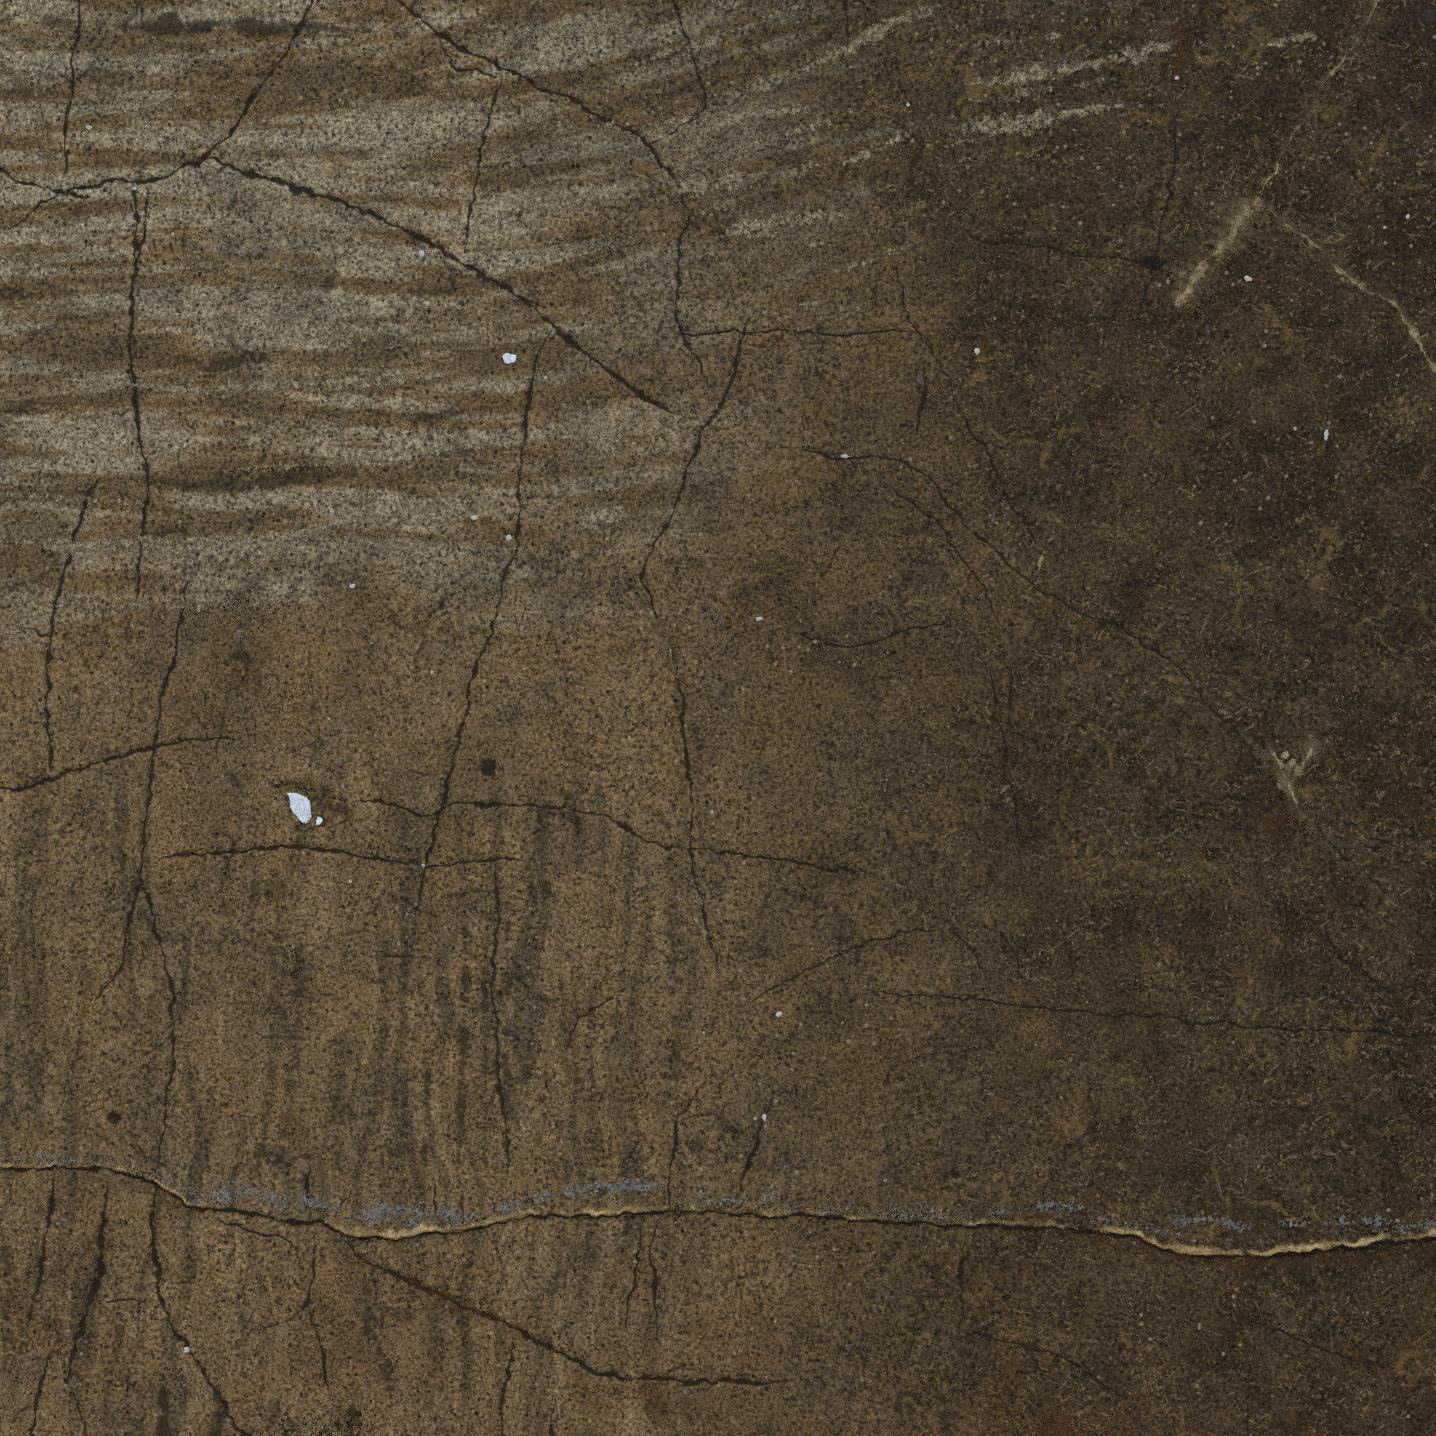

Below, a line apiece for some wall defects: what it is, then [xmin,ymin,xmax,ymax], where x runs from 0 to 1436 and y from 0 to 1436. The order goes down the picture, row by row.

crack [0,0,1035,1436]